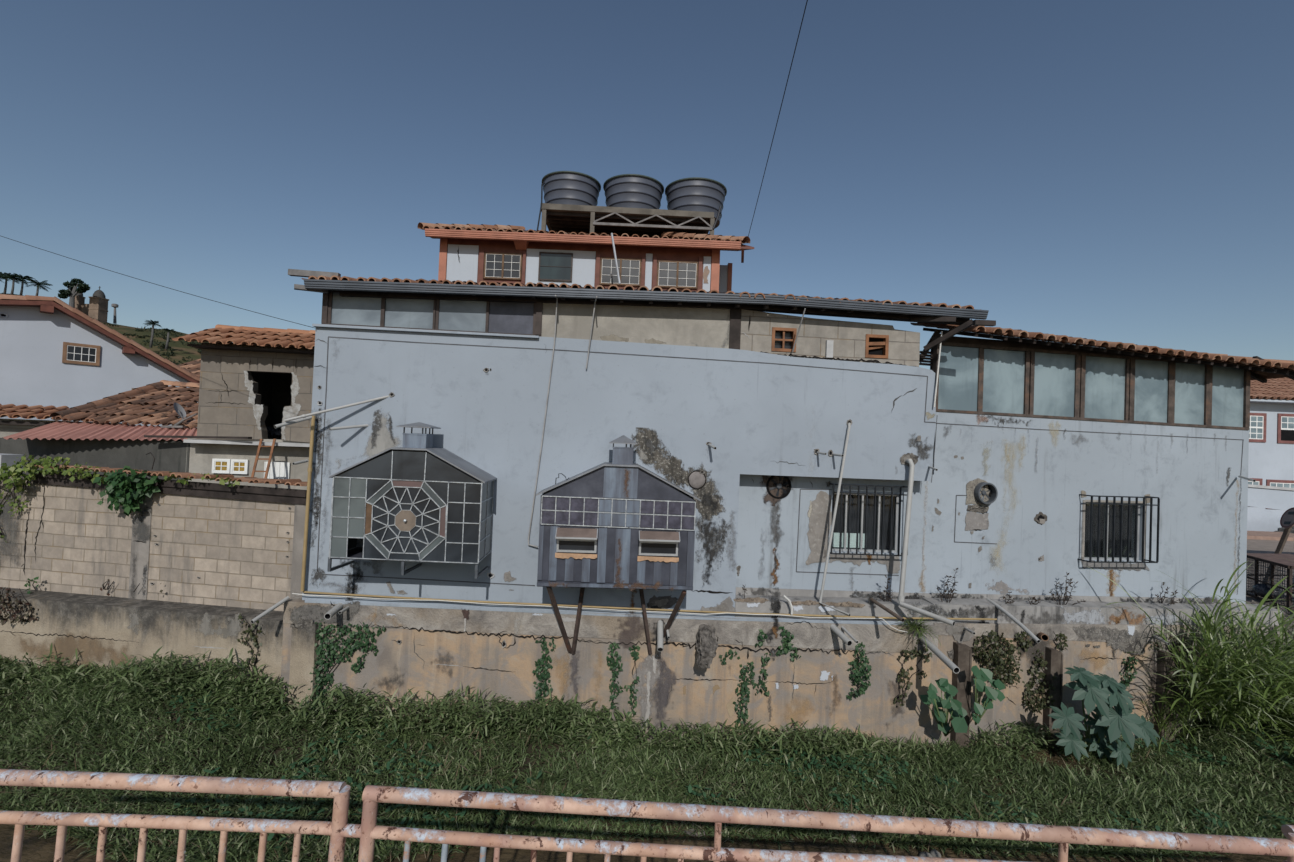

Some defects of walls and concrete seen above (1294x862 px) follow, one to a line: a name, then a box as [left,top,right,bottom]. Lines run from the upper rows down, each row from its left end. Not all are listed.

spalling [243,371,263,430]
crack [208,339,325,404]
crack [744,317,918,413]
spalling [900,453,919,466]
damp [771,503,781,547]
peeling [806,491,900,574]
damp [633,605,676,729]